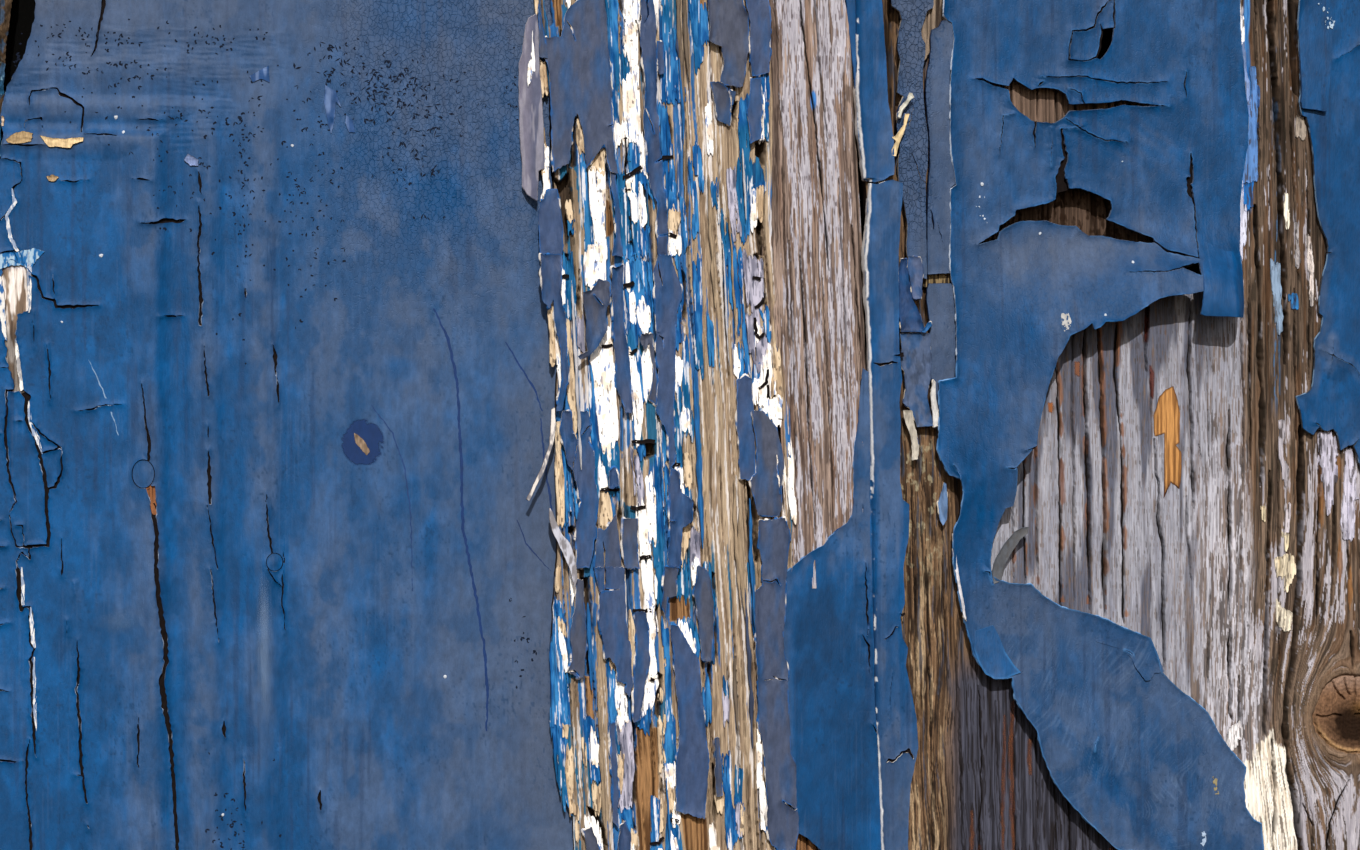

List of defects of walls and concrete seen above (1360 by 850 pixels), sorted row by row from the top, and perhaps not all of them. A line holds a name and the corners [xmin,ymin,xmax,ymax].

peeling [0,188,45,454]
peeling [21,567,37,731]
crack [0,0,162,850]
crack [137,503,179,850]
peeling [504,0,819,850]
peeling [891,0,1266,850]
peeling [1274,419,1297,632]
peeling [1317,430,1359,542]